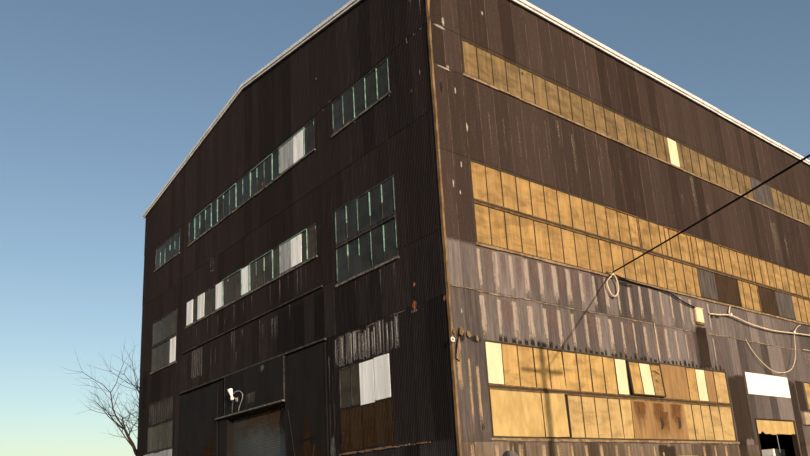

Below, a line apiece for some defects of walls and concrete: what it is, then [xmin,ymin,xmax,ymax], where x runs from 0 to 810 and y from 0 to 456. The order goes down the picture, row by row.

peeling [335,310,404,367]
peeling [191,347,202,378]
rust [635,402,681,428]